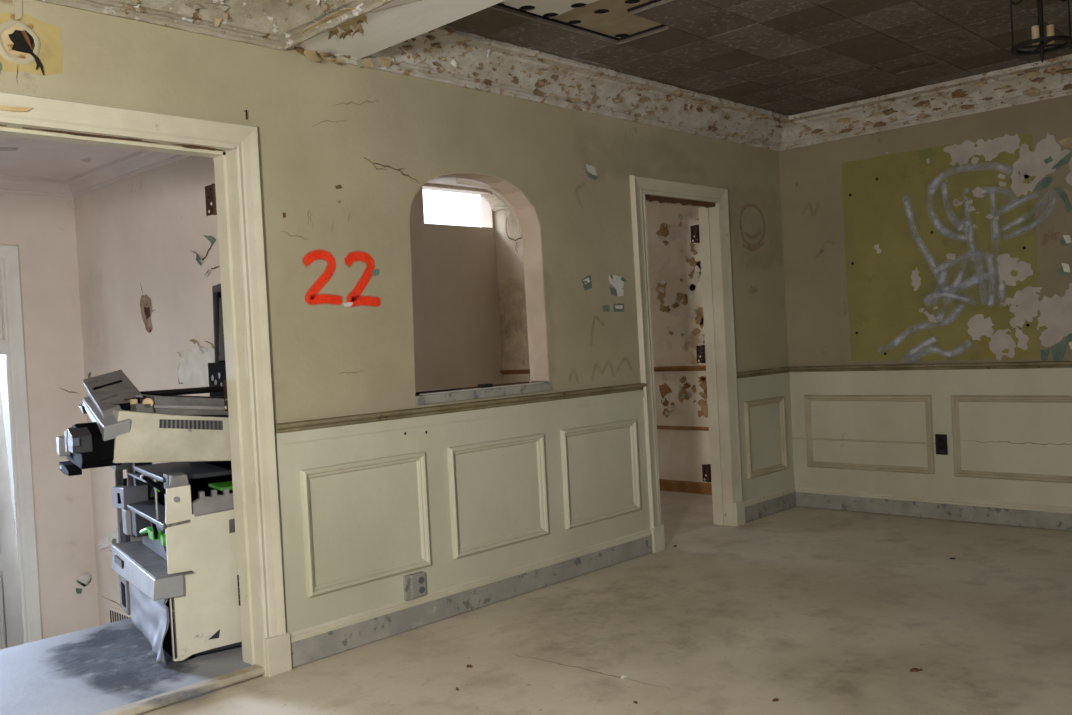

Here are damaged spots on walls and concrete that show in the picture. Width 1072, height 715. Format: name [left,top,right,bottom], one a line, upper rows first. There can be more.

spalling [0,1,44,84]
peeling [294,0,604,104]
peeling [490,0,674,45]
peeling [951,61,1072,110]
peeling [634,89,791,143]
peeling [810,97,941,136]
crack [363,157,420,184]
peeling [926,132,1072,213]
spalling [140,283,155,333]
peeling [655,212,705,350]
peeling [967,254,1072,361]
peeling [659,376,708,418]